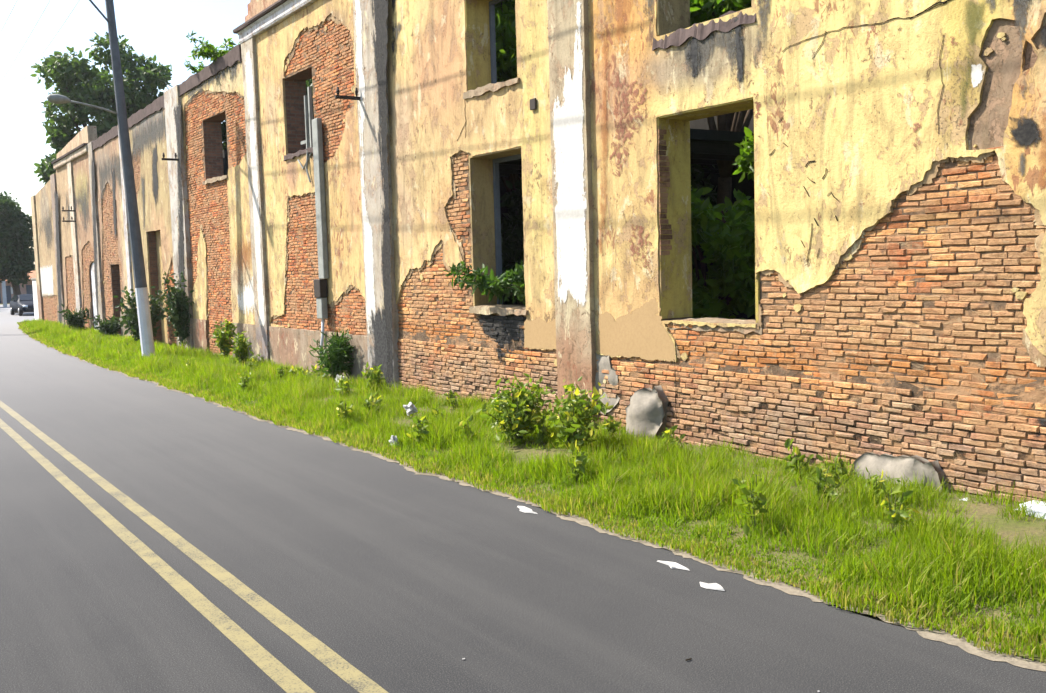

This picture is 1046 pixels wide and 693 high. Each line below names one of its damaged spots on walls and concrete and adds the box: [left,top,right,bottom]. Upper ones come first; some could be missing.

flaking render [42,183,122,328]
flaking render [184,0,376,356]
water stain [369,0,401,387]
flaking render [397,150,558,416]
water stain [477,314,526,363]
peeling [552,1,588,306]
water stain [674,0,770,82]
flaking render [596,18,1046,503]
crack [784,0,949,59]
crack [936,34,944,133]
water stain [962,64,983,111]
water stain [1009,116,1042,176]